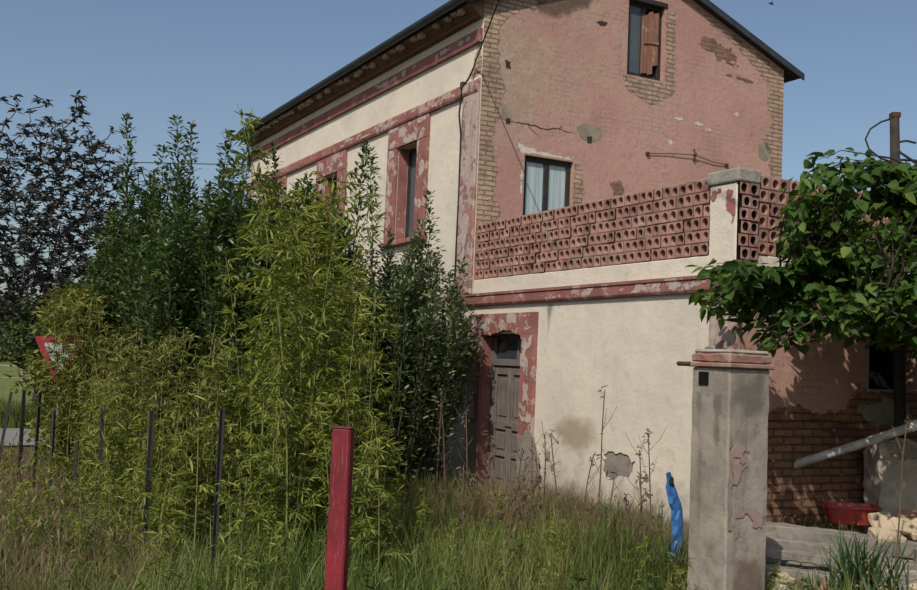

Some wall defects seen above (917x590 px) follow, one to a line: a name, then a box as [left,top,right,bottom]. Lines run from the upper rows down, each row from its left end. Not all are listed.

water stain [538,0,590,15]
flaking render [622,10,676,104]
flaking render [683,0,784,179]
flaking render [318,0,554,259]
crack [510,121,576,134]
flaking render [518,142,572,194]
flaking render [610,181,624,197]
peeling [710,187,736,223]
peeling [619,279,708,293]
flaking render [472,313,559,502]
flaking render [604,451,635,479]
flaking render [727,383,894,540]